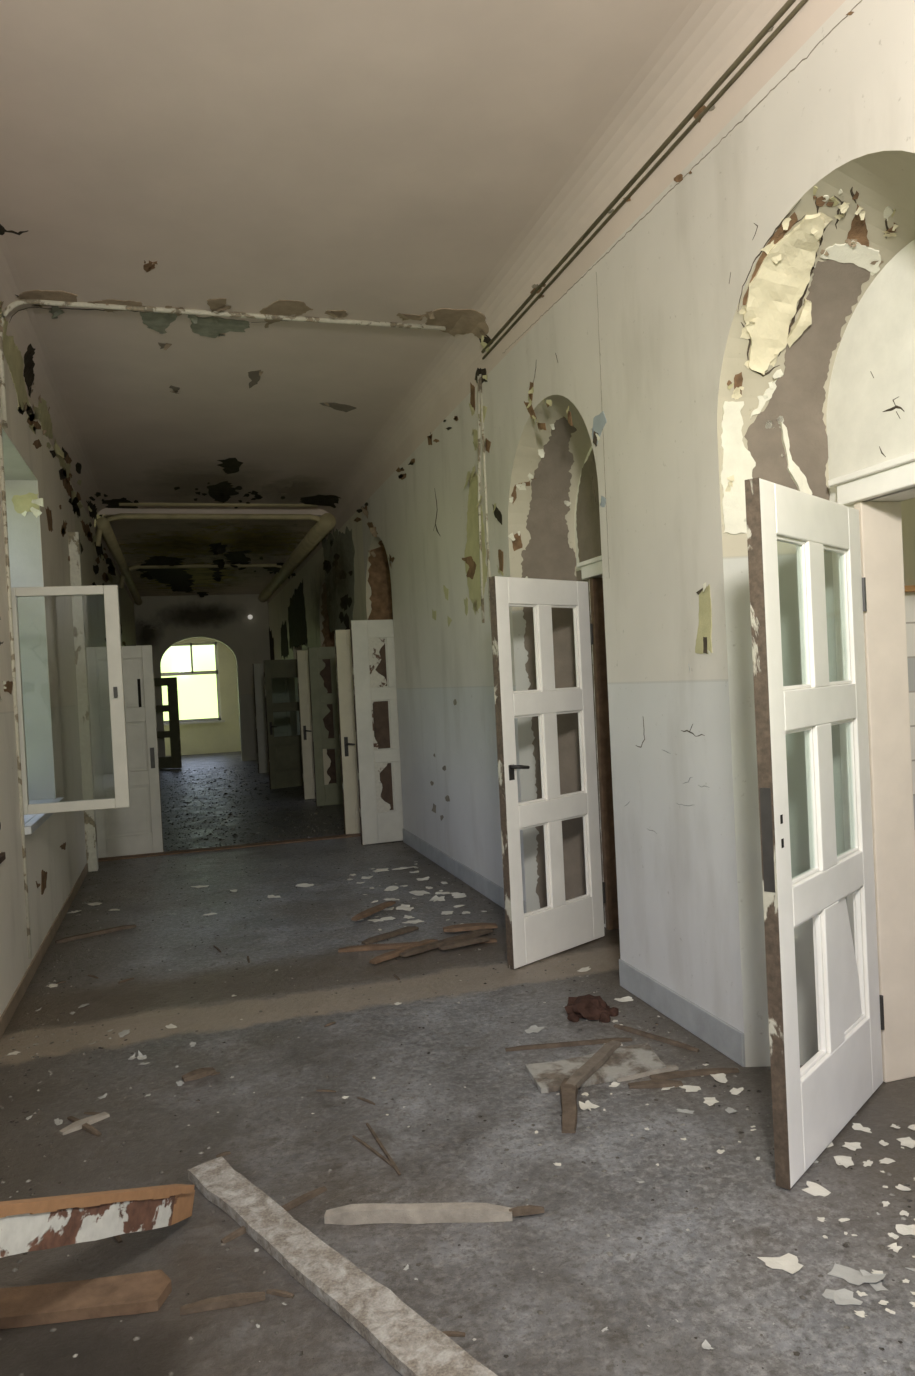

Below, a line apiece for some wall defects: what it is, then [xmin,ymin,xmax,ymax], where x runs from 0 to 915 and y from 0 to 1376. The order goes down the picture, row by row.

flaking render [0,290,348,585]
peeling [320,402,356,412]
flaking render [321,502,395,647]
peeling [396,308,607,908]
peeling [695,583,712,656]
peeling [720,202,899,534]